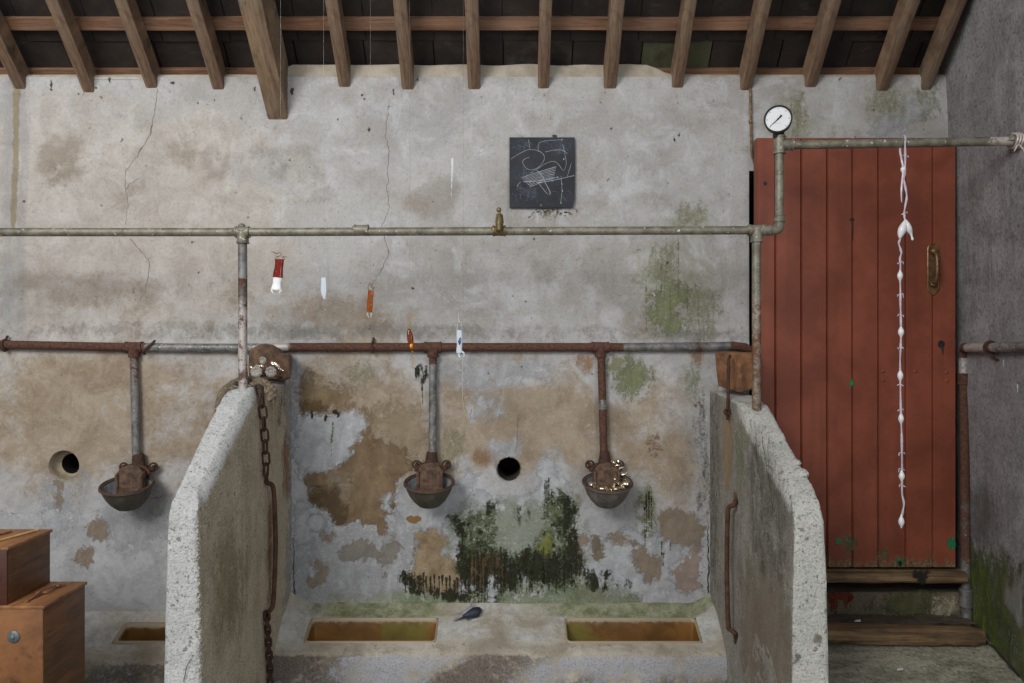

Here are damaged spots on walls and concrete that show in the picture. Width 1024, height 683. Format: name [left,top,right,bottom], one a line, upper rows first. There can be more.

water stain [646,243,722,341]
peeling [303,426,413,578]
water stain [291,432,574,603]